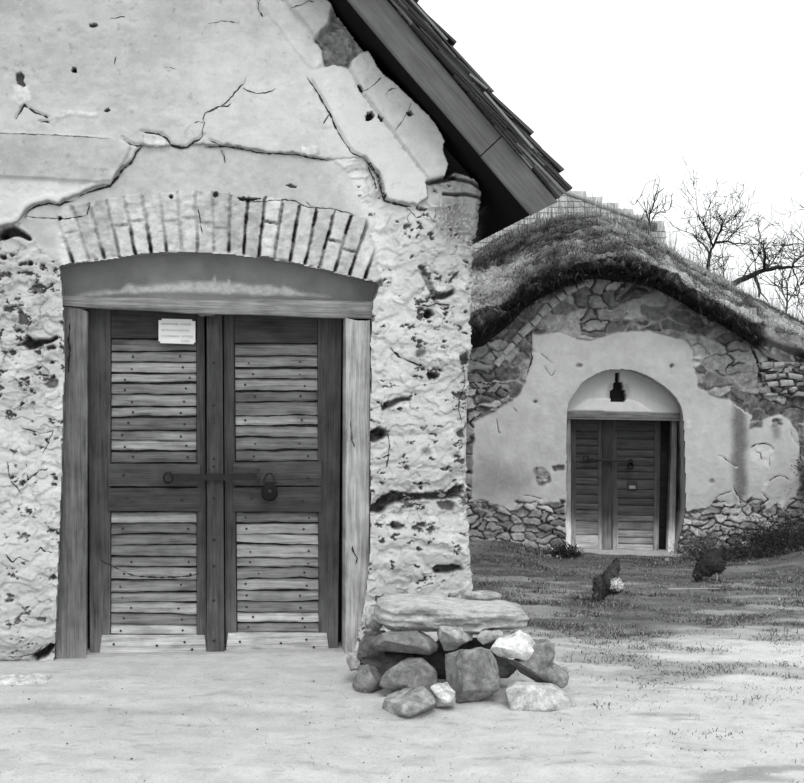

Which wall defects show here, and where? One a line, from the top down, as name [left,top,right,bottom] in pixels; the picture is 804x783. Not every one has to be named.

spalling [315,13,364,68]
crack [2,78,328,219]
crack [242,199,356,216]
crack [307,77,437,223]
spalling [0,133,804,651]
spalling [0,614,56,661]